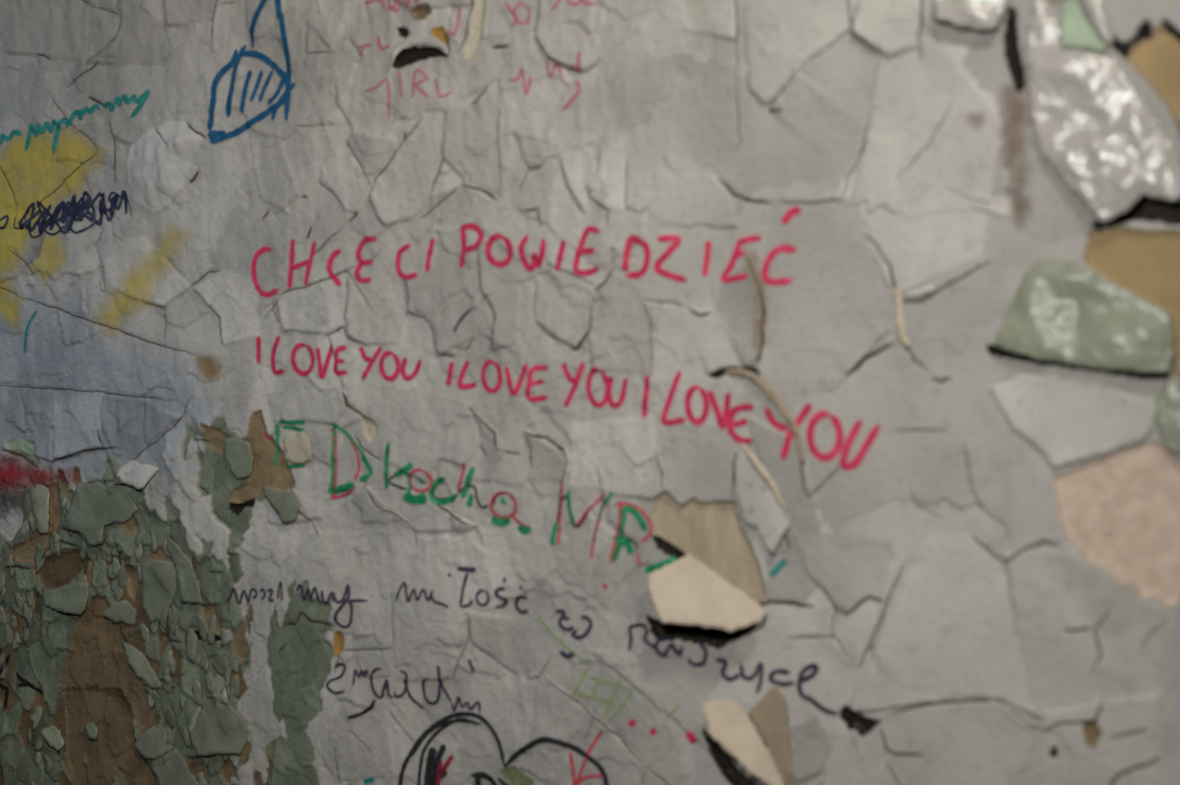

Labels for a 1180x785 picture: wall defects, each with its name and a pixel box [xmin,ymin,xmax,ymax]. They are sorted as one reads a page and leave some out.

flaking render [390,0,486,67]
crack [421,86,649,351]
crack [0,246,195,355]
crack [267,82,423,547]
crack [707,247,766,378]
crack [847,344,951,382]
peeling [989,0,1180,607]
crack [0,385,212,488]
peeling [116,460,159,489]
flaking render [199,410,312,523]
flaking render [645,443,797,632]
flaking render [0,483,248,785]